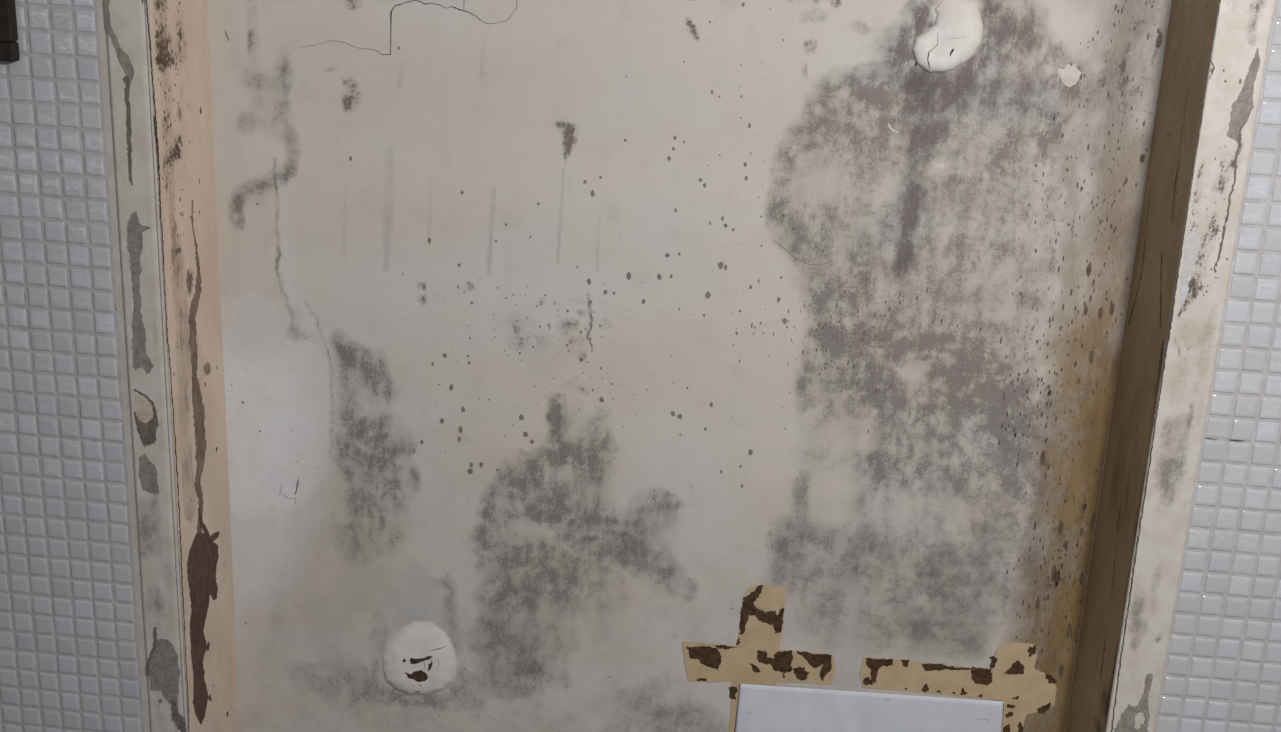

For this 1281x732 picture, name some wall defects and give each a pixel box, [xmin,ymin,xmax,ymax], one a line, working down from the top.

peeling [104,0,134,185]
crack [298,0,517,55]
peeling [1227,48,1260,155]
peeling [127,212,154,374]
peeling [134,389,159,494]
peeling [146,200,219,724]
damp [335,341,398,402]
damp [333,404,444,547]
damp [467,378,648,678]
damp [726,0,1242,732]